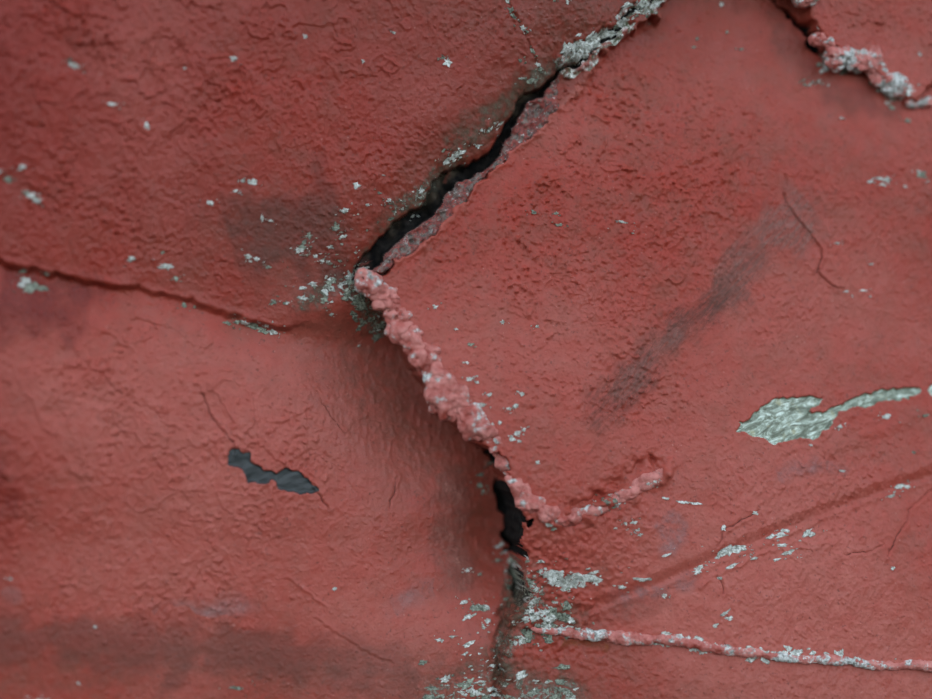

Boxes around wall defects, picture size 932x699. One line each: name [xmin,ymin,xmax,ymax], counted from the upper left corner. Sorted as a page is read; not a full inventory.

crack [772,0,822,57]
crack [352,0,666,282]
crack [783,182,836,288]
peeling [736,385,932,447]
peeling [228,449,319,495]
crack [477,446,541,612]
crack [846,490,932,556]